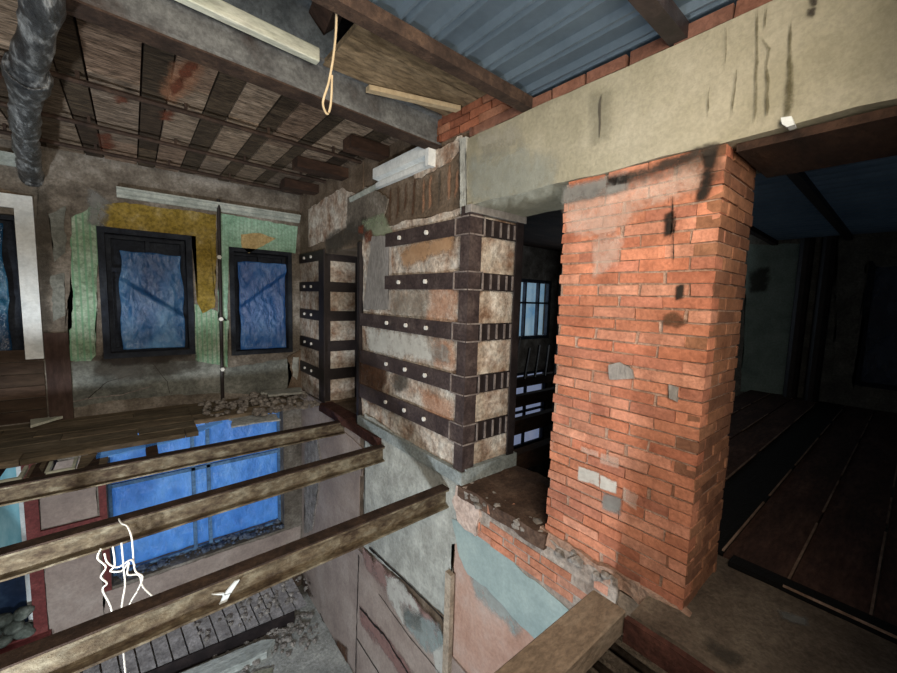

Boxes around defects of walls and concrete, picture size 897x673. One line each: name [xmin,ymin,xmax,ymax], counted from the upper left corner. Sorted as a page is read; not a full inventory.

corrosion [66,0,442,150]
leakage [755,10,770,113]
leakage [785,26,793,113]
flaking render [308,186,392,253]
flaking render [414,135,469,214]
spalling [452,482,692,639]